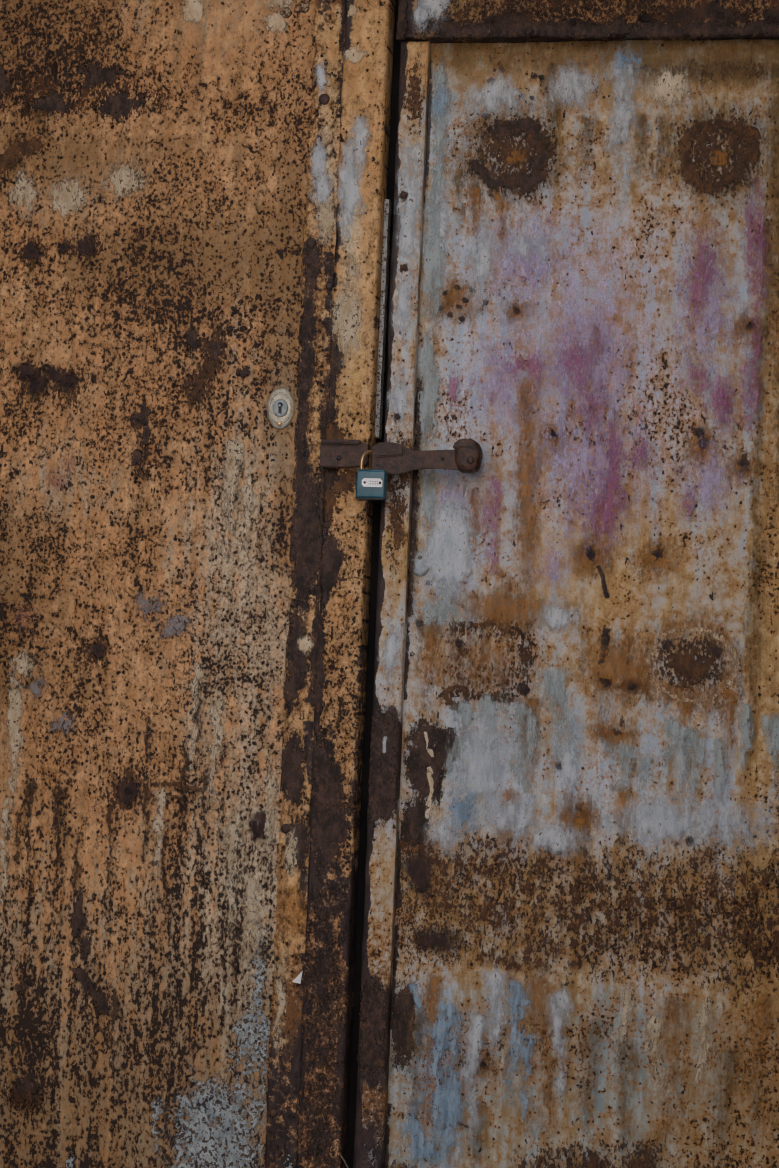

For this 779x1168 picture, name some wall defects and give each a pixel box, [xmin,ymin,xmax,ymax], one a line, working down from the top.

corrosion [0,9,210,178]
corrosion [455,64,568,244]
corrosion [438,0,779,83]
corrosion [660,102,779,199]
corrosion [384,472,411,580]
corrosion [416,375,568,789]
corrosion [280,236,357,1168]
corrosion [580,613,746,754]
peeling [367,707,460,848]
peeling [357,976,424,1079]
corrosion [393,786,779,1130]
corrosion [510,1128,762,1168]